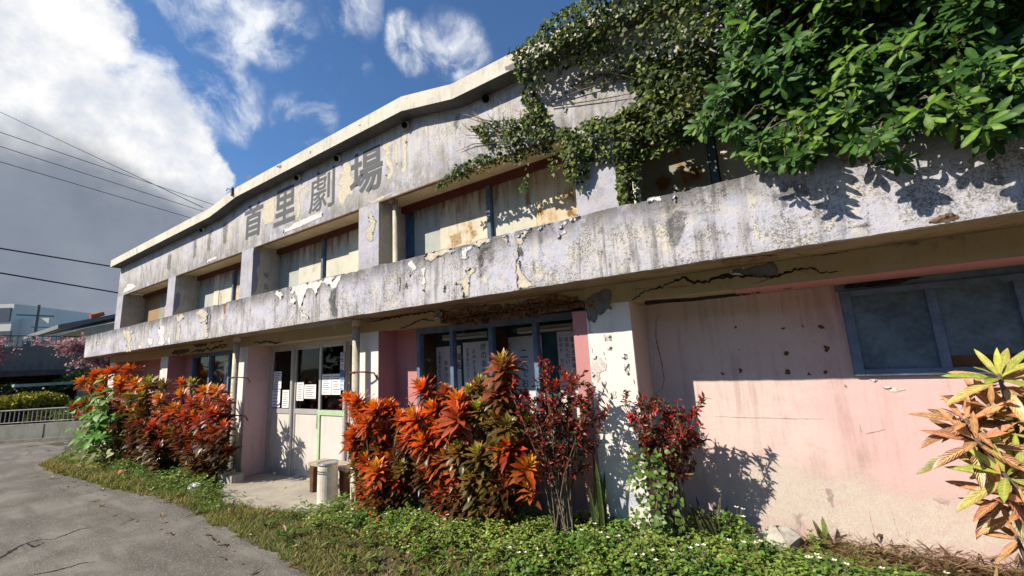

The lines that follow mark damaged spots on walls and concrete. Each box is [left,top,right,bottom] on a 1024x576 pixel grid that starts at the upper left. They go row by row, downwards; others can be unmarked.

peeling [366,132,421,241]
water stain [665,209,688,250]
water stain [771,181,819,217]
spalling [929,212,959,223]
peeling [252,250,354,329]
spalling [407,215,614,326]
crack [632,251,848,300]
peeling [123,292,223,355]
peeling [591,334,630,382]